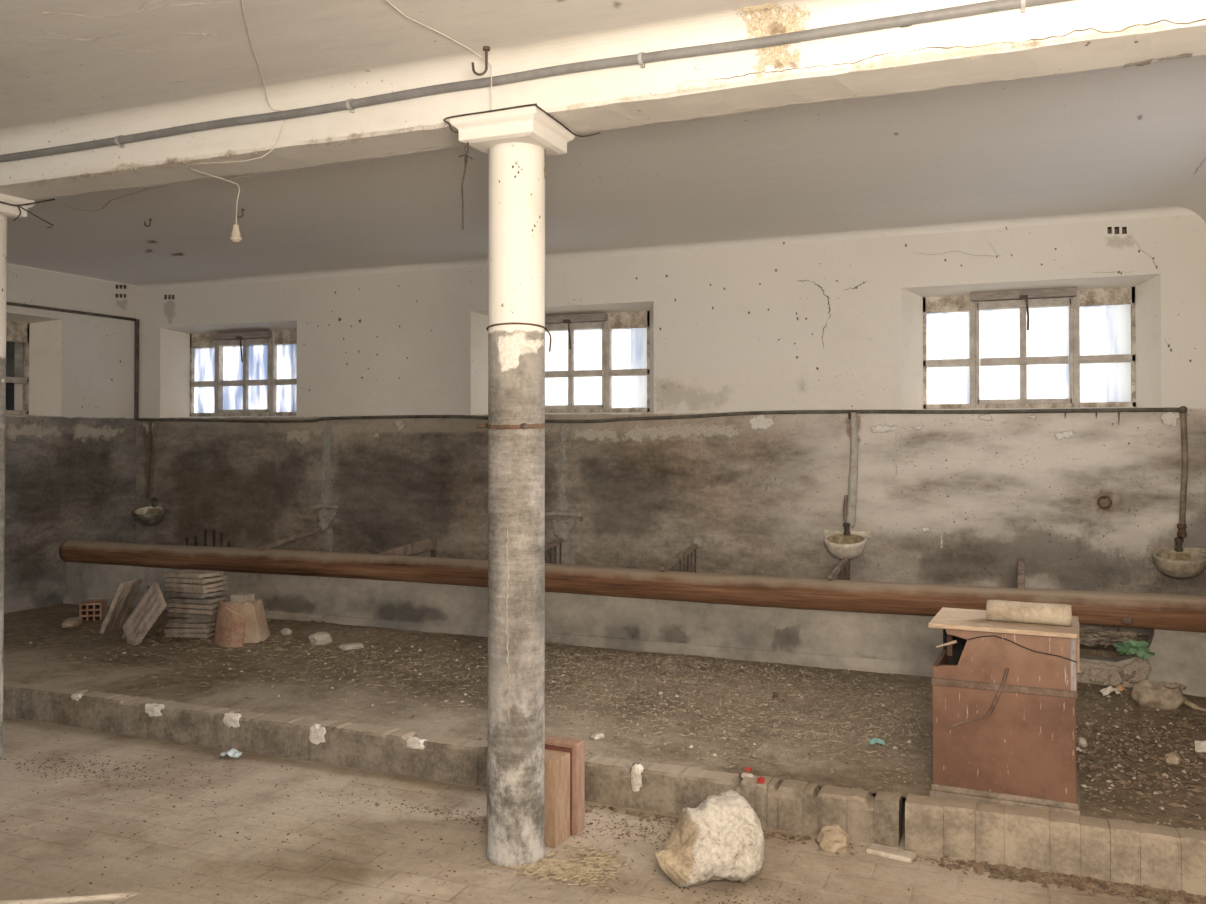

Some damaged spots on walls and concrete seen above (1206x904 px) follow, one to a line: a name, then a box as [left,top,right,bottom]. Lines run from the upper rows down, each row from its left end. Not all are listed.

peeling [735,3,810,79]
crack [588,19,1206,132]
crack [800,280,867,349]
peeling [498,330,545,372]
flaking render [569,415,774,443]
spalling [1077,656,1151,691]